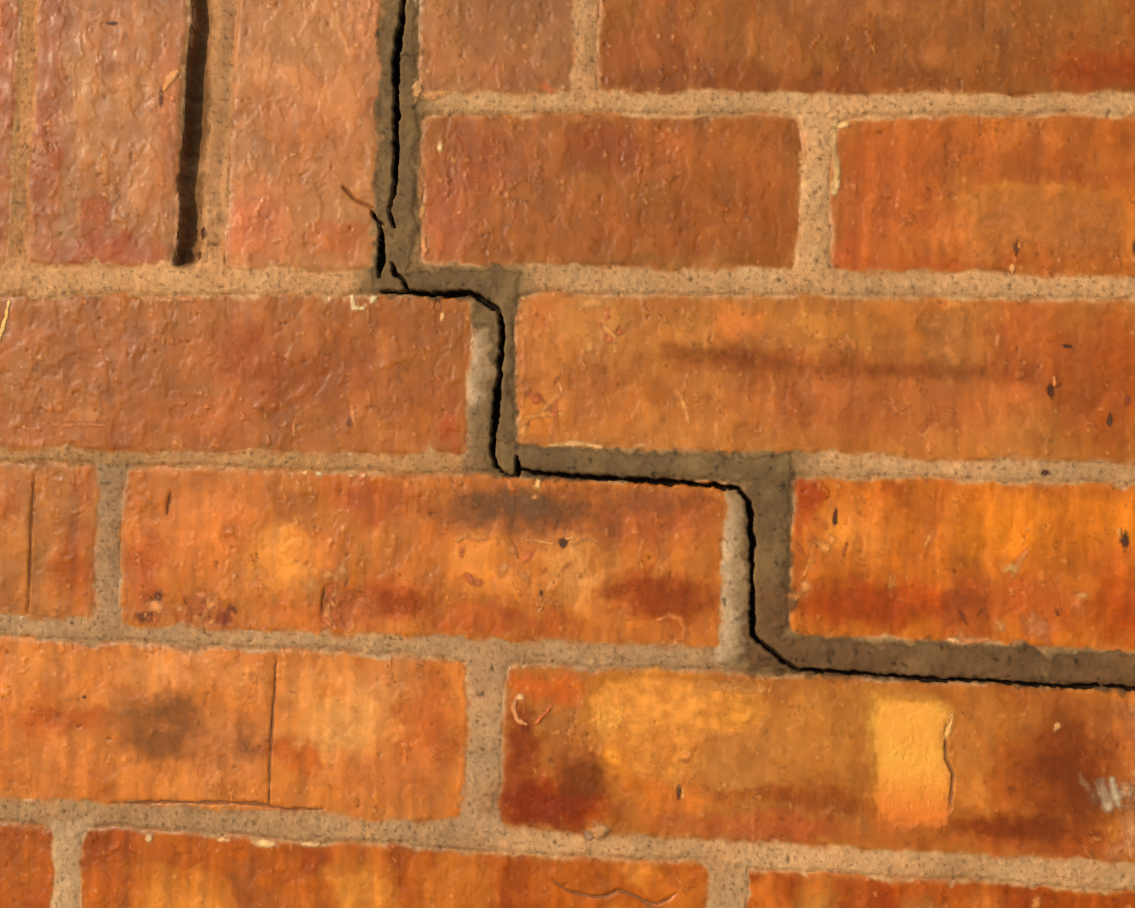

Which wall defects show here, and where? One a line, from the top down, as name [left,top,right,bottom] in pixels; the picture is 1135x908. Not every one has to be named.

crack [343,0,1135,691]
crack [111,657,323,811]
crack [944,738,955,809]
crack [552,879,676,908]